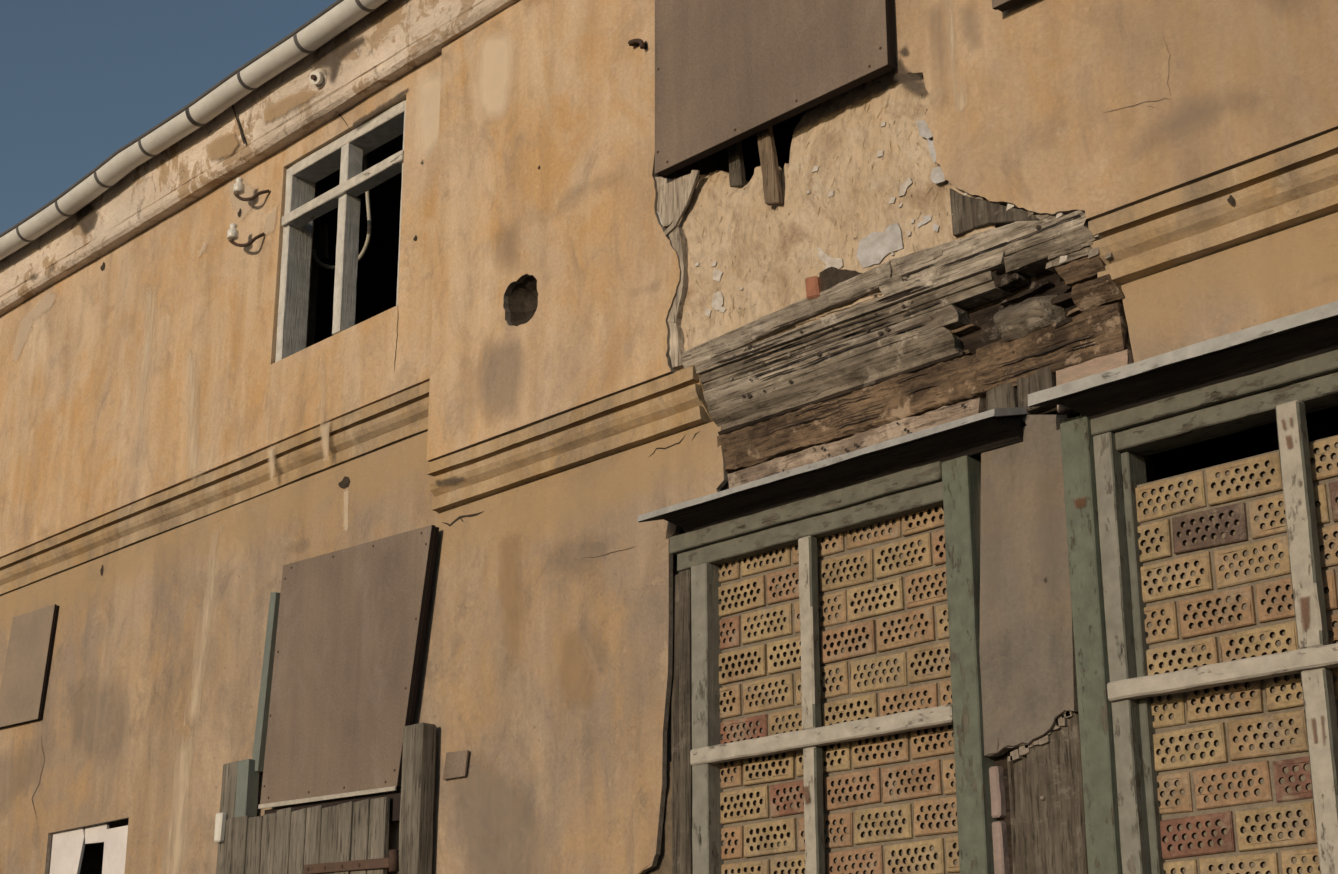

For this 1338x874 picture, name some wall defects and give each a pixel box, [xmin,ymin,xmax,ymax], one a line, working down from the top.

crack [1104,38,1171,113]
spalling [655,70,996,371]
crack [650,431,700,456]
spalling [645,762,672,874]
spalling [989,711,1088,874]